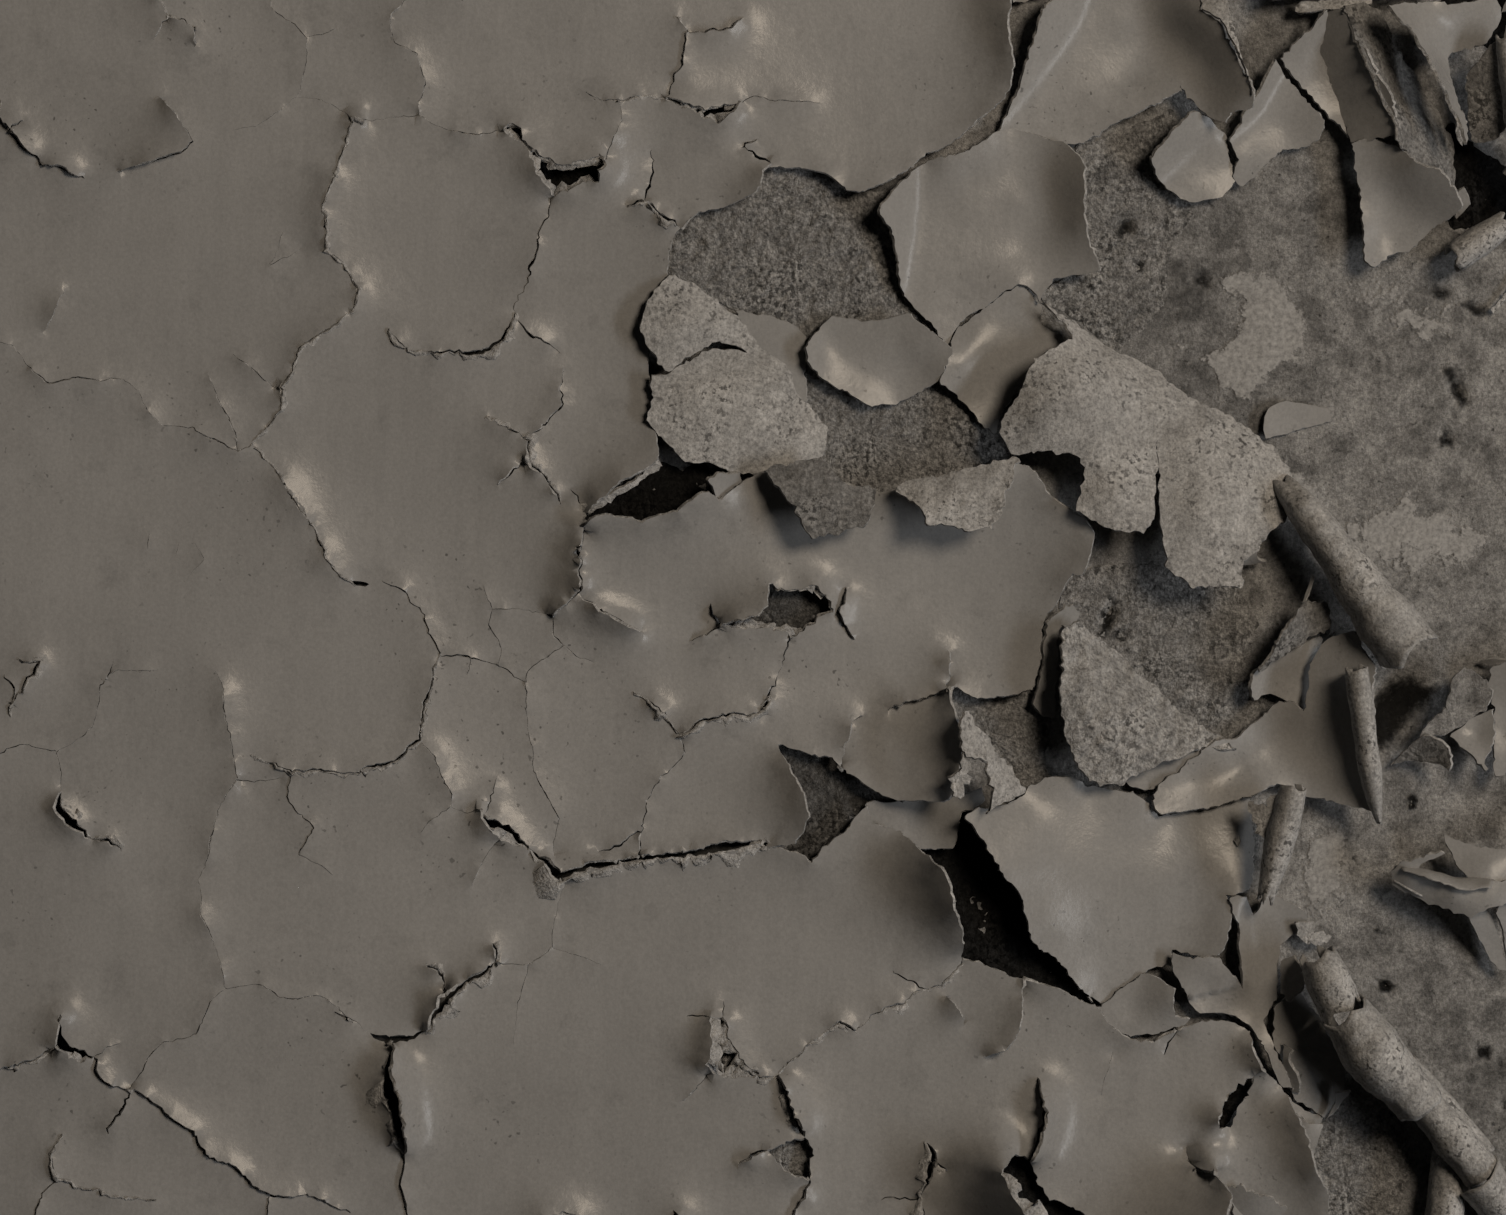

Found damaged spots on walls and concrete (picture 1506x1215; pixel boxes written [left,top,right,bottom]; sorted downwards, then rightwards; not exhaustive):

crack [627,167,679,230]
crack [741,141,769,162]
crack [190,117,602,782]
peeling [585,0,1506,1215]
crack [2,655,46,753]
crack [633,634,790,752]
crack [56,752,125,850]
crack [530,785,771,899]
crack [95,1054,143,1133]
crack [336,942,502,1166]
crack [704,961,963,1158]
crack [884,1142,947,1215]